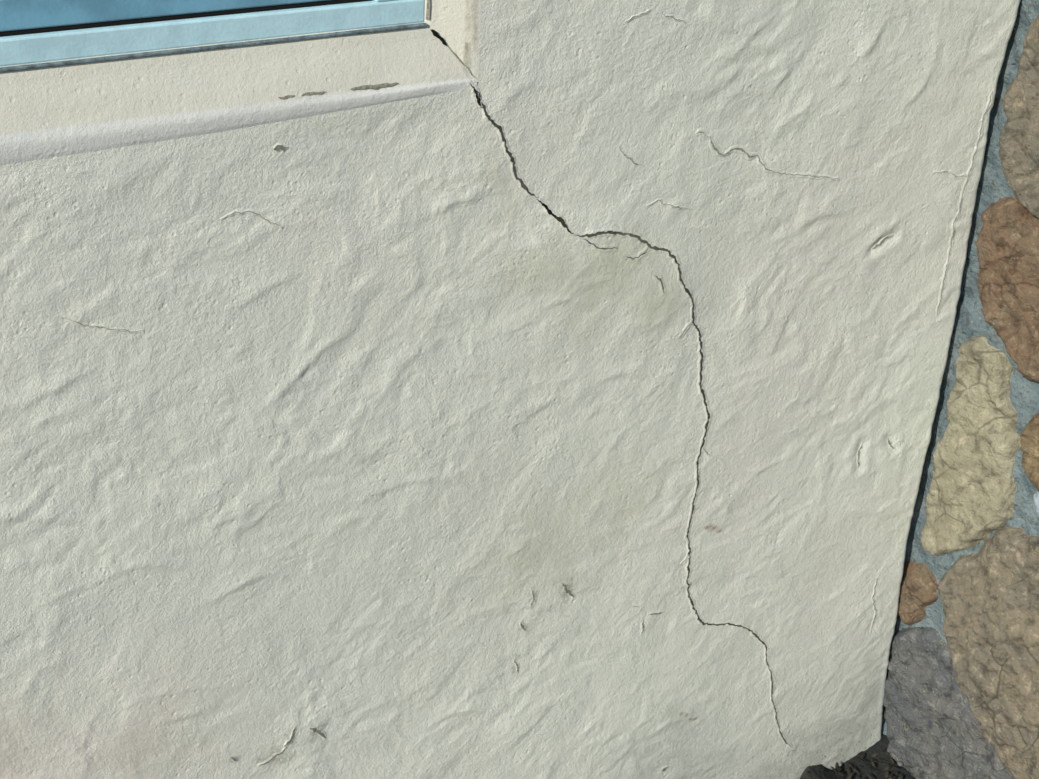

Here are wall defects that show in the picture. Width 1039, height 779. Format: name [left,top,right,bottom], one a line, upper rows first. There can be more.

crack [431,29,793,748]
crack [695,128,839,182]